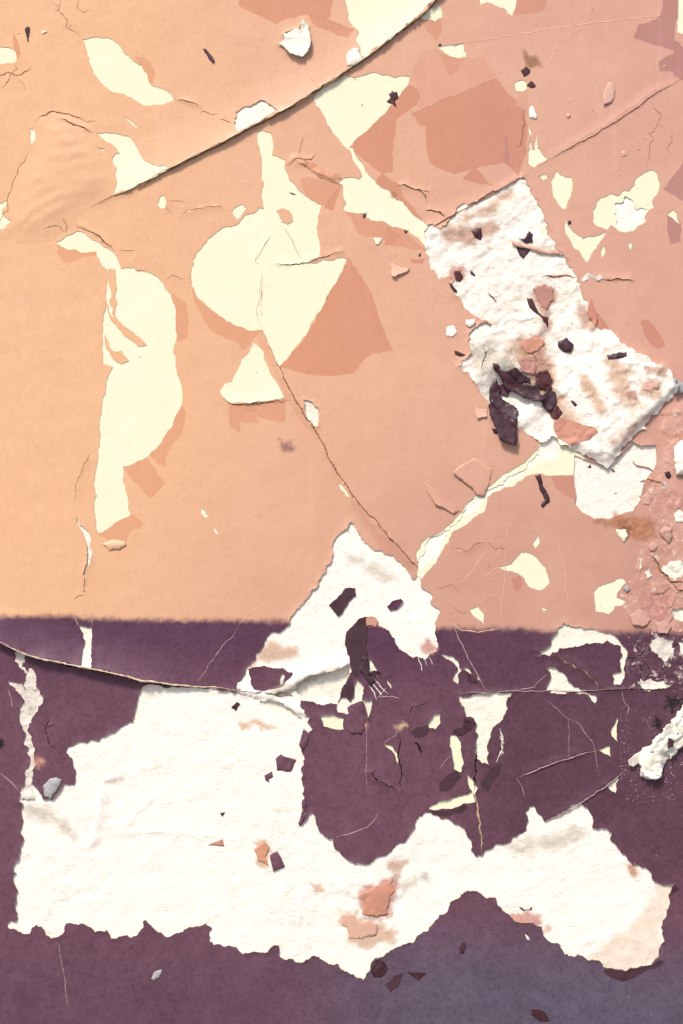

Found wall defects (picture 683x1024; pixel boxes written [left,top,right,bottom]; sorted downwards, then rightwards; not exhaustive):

peeling [83,37,174,106]
crack [42,0,437,279]
peeling [56,100,347,592]
crack [229,228,418,572]
crack [0,642,236,691]
flaking render [7,177,683,979]
crack [473,745,483,854]